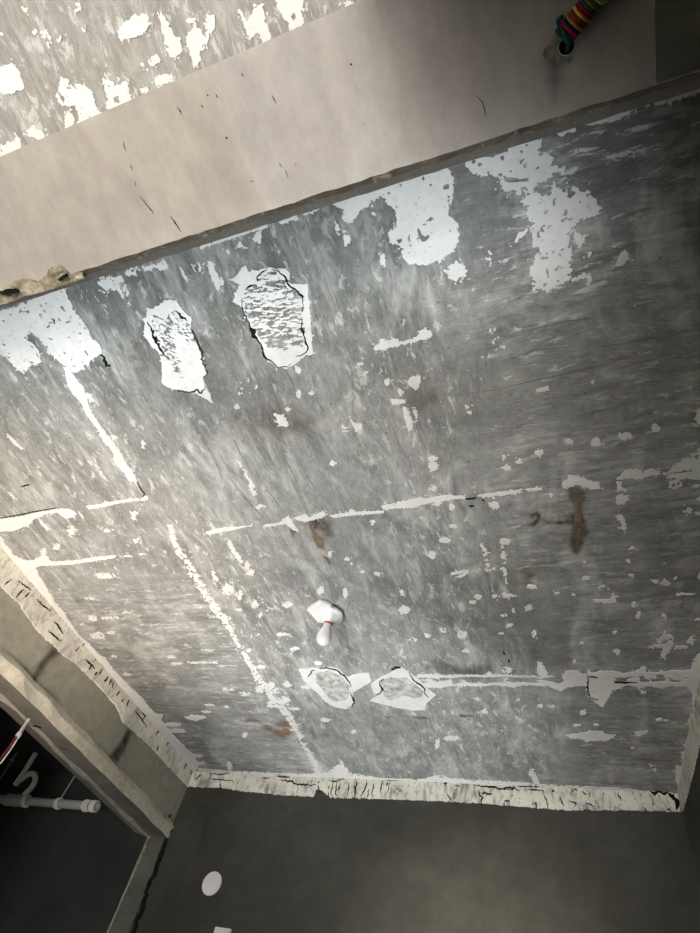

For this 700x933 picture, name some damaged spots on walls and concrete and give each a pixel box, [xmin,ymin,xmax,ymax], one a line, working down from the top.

peeling [55,11,216,128]
peeling [238,0,308,43]
peeling [333,168,468,285]
peeling [465,138,602,293]
peeling [0,265,103,376]
peeling [142,298,215,404]
peeling [97,259,315,374]
corrosion [310,521,328,560]
corrosion [531,488,584,553]
crack [5,580,169,751]
peeling [0,538,700,812]
crack [650,791,680,810]